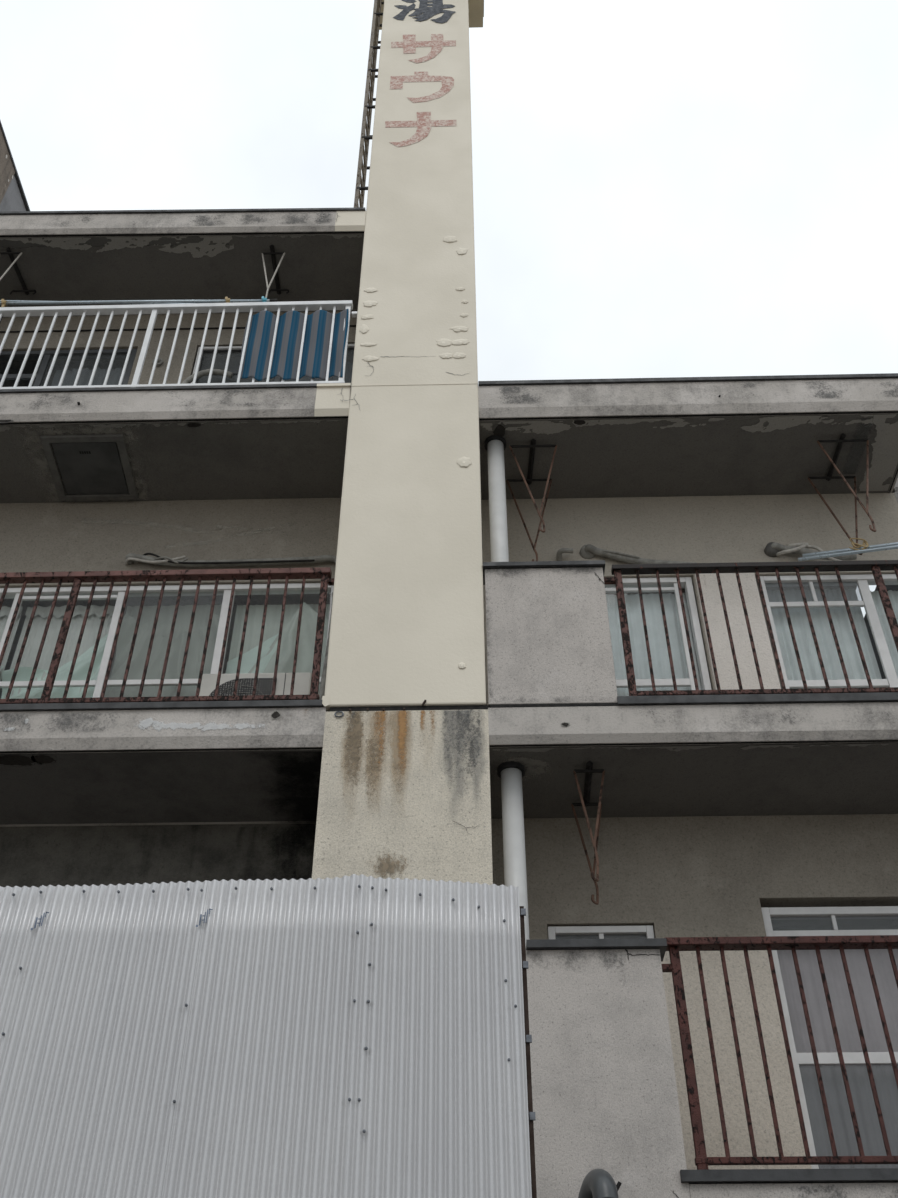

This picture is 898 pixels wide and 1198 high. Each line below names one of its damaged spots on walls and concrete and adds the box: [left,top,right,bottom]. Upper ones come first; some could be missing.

peeling [0,234,362,258]
peeling [481,418,725,439]
rust [374,710,434,768]